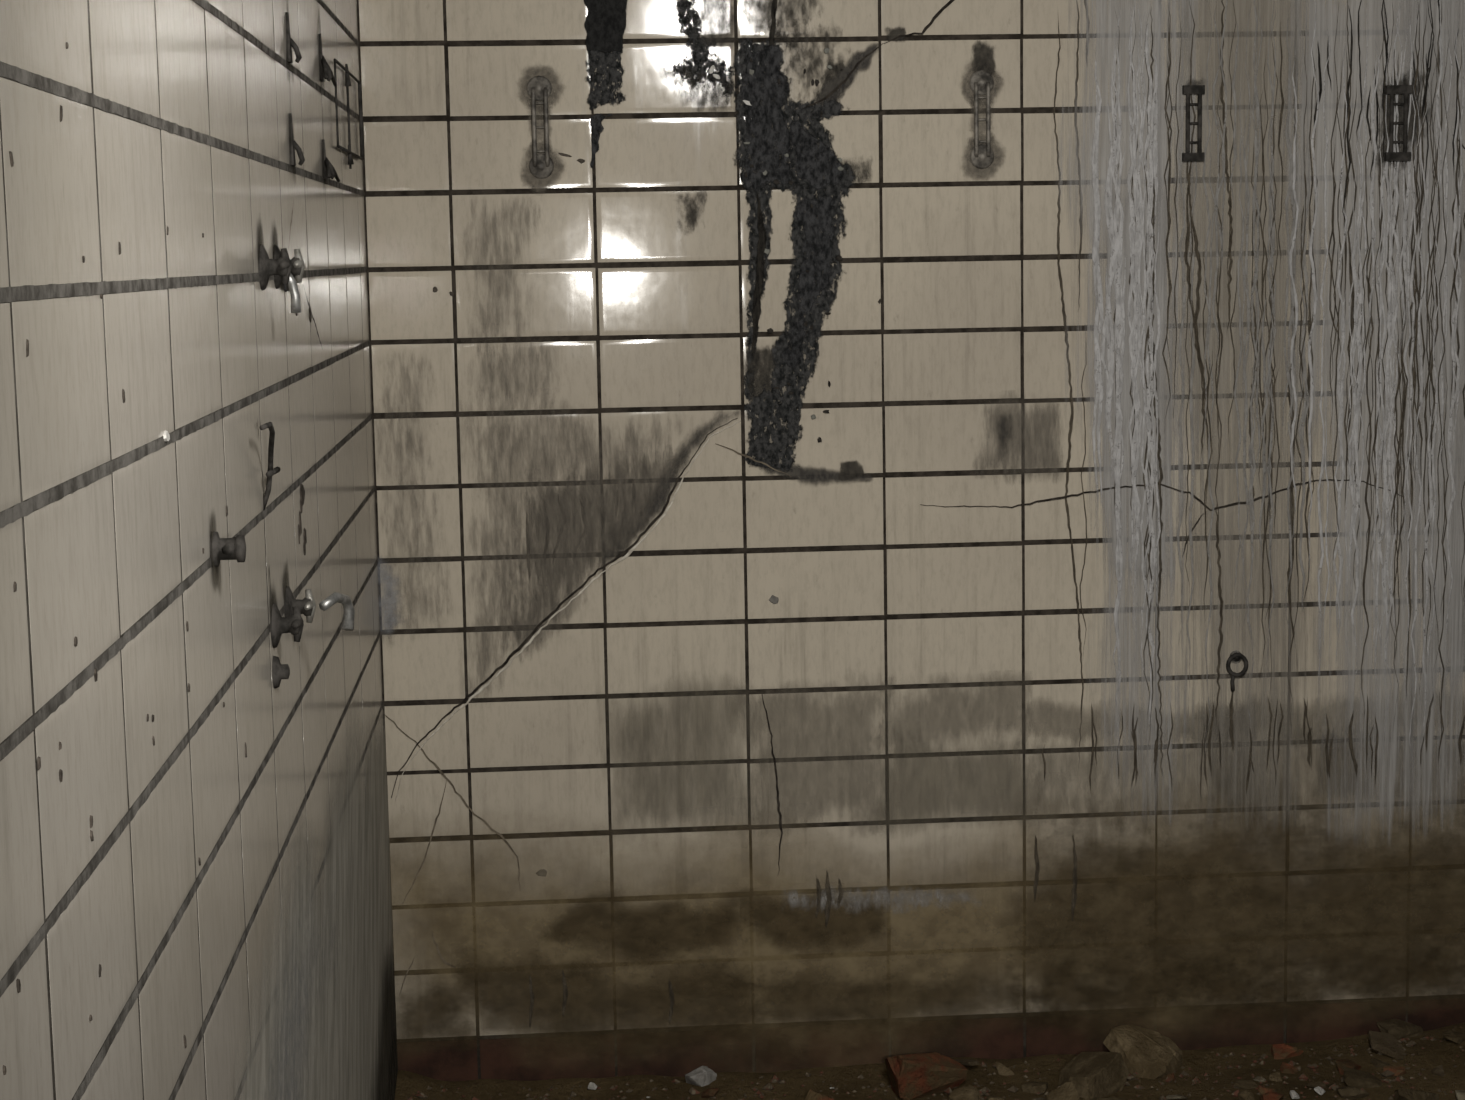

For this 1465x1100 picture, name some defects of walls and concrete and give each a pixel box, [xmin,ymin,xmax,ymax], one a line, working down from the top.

crack [383,418,790,906]
crack [920,479,1405,557]
water stain [987,0,1465,820]
water stain [244,735,398,1100]